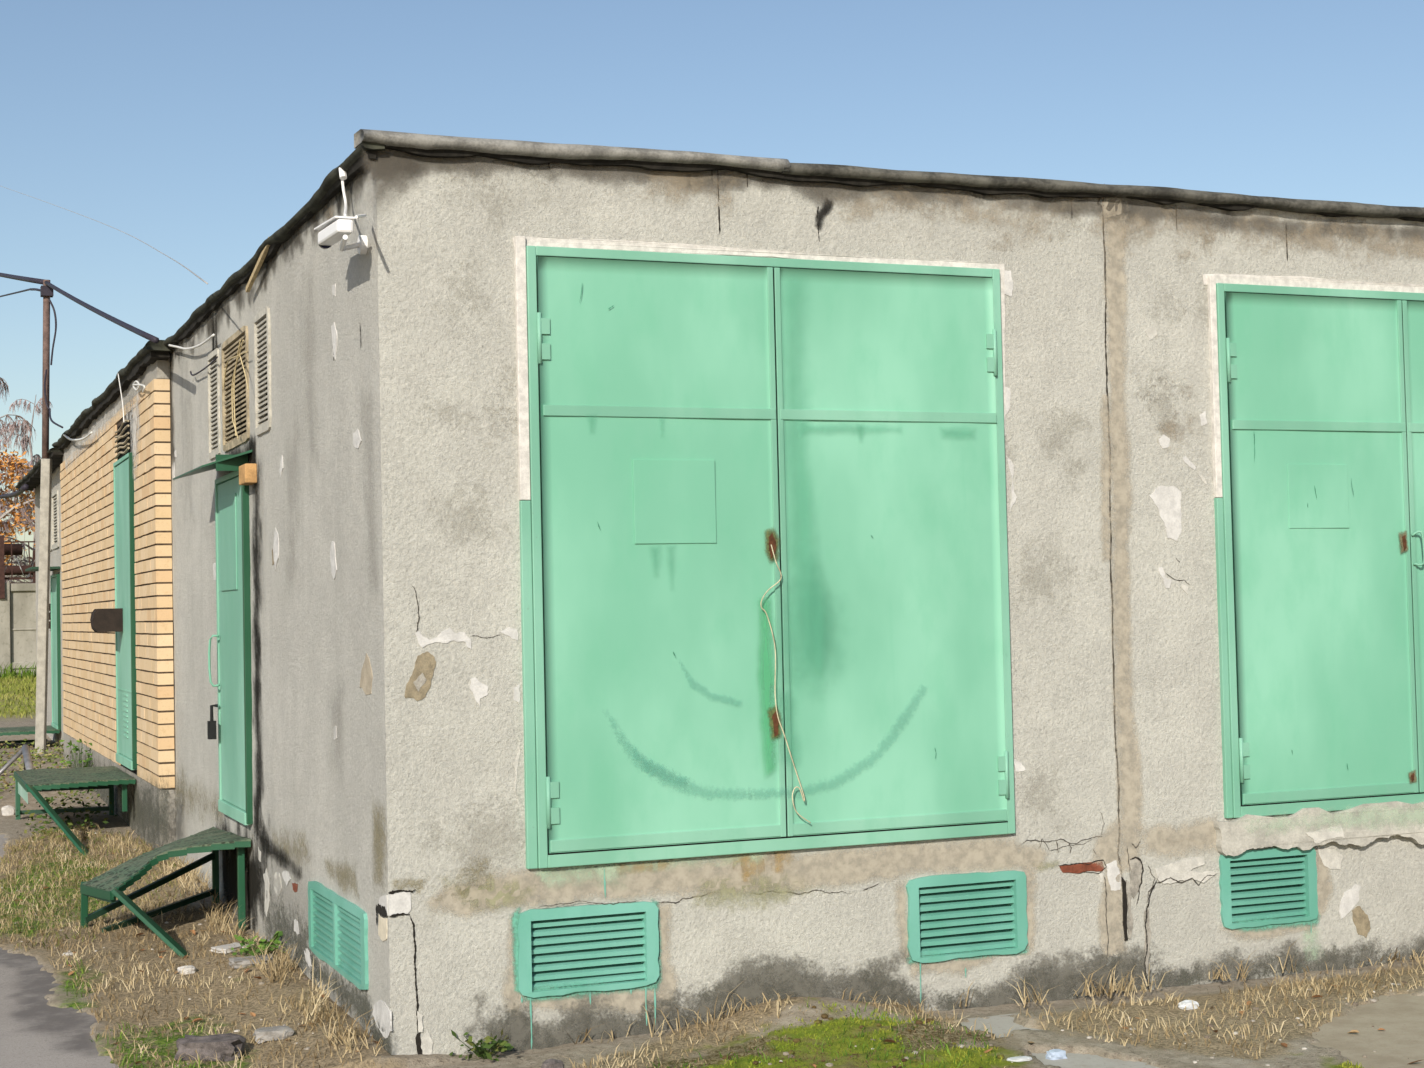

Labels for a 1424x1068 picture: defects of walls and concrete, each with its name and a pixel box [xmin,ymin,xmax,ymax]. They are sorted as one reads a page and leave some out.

peeling [1158,434,1170,449]
corrosion [765,529,779,561]
crack [1022,198,1133,956]
peeling [1149,486,1182,541]
spalling [405,584,518,705]
damp [216,465,392,1056]
spalling [1038,801,1424,990]
damp [467,937,1424,1052]